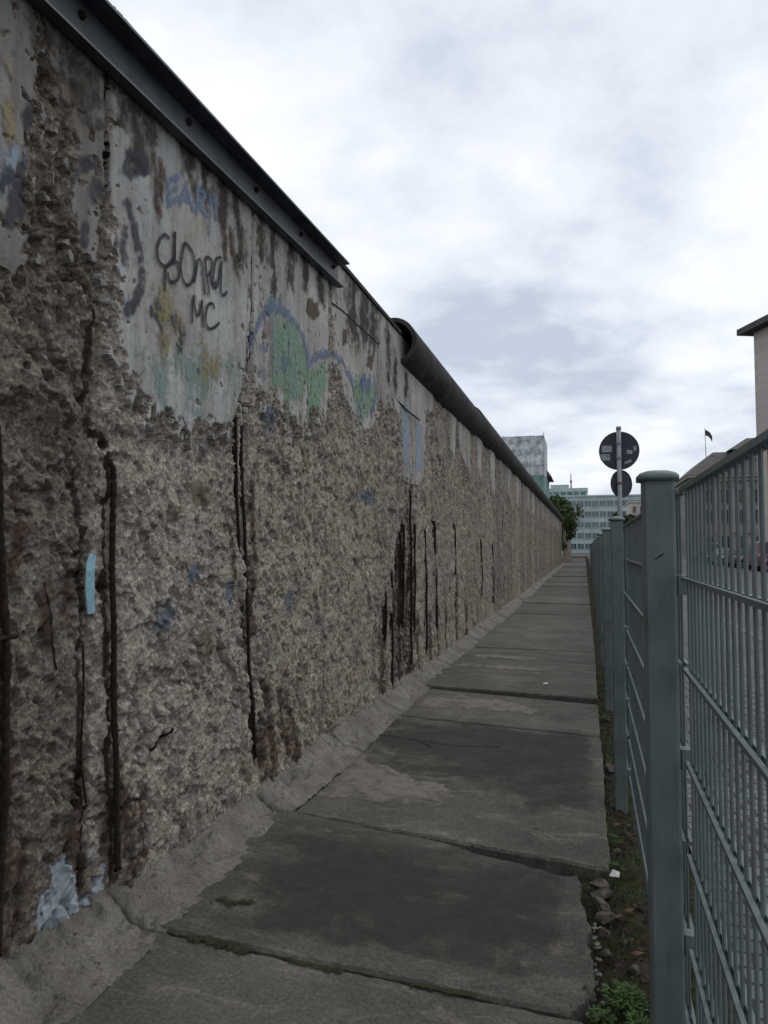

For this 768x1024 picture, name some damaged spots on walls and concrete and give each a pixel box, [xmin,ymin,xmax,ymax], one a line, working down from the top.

spalling [0,10,571,962]